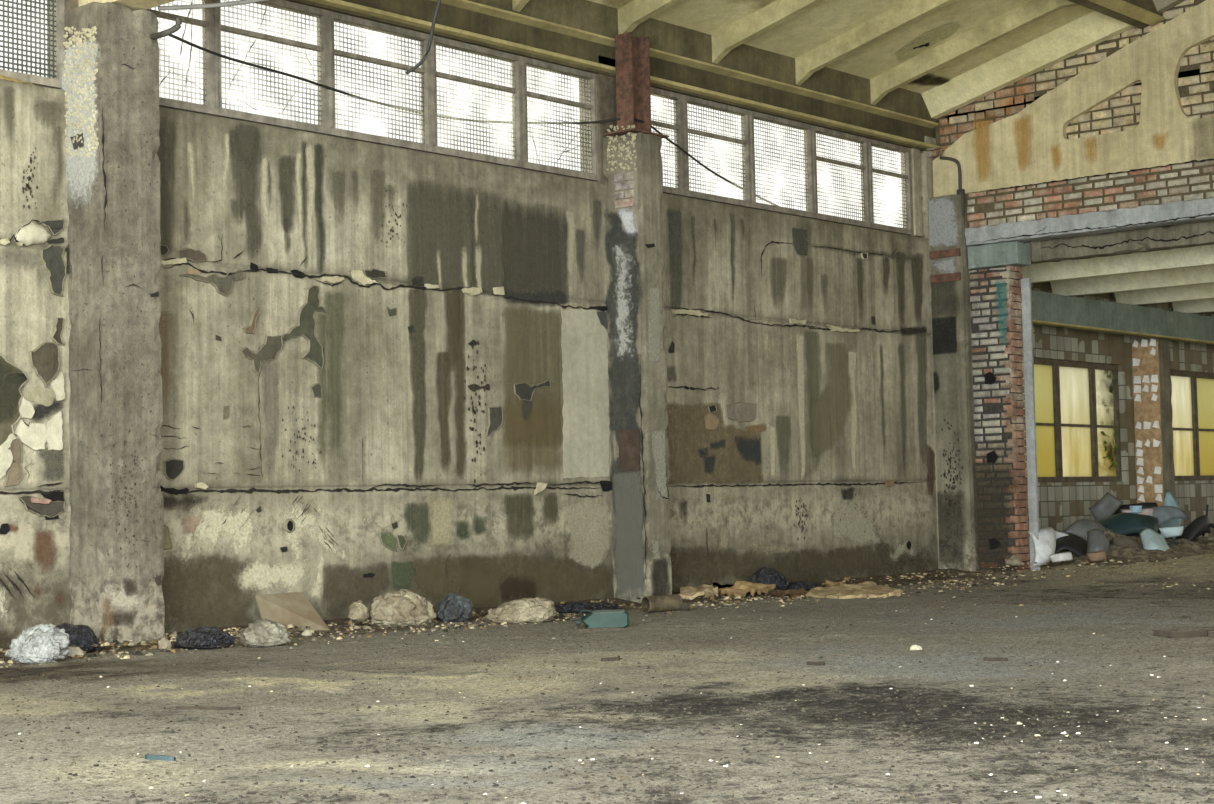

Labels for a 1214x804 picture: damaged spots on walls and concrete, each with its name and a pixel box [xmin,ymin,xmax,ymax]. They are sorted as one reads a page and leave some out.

water stain [157,124,195,251]
water stain [223,124,357,271]
rust [976,121,988,178]
rust [1016,119,1029,165]
spalling [0,523,17,535]
crack [0,460,65,513]
peeling [0,318,66,520]
crack [151,373,612,497]
crack [161,235,607,311]
water stain [407,185,601,478]
peeling [596,172,675,598]
water stain [161,557,247,628]